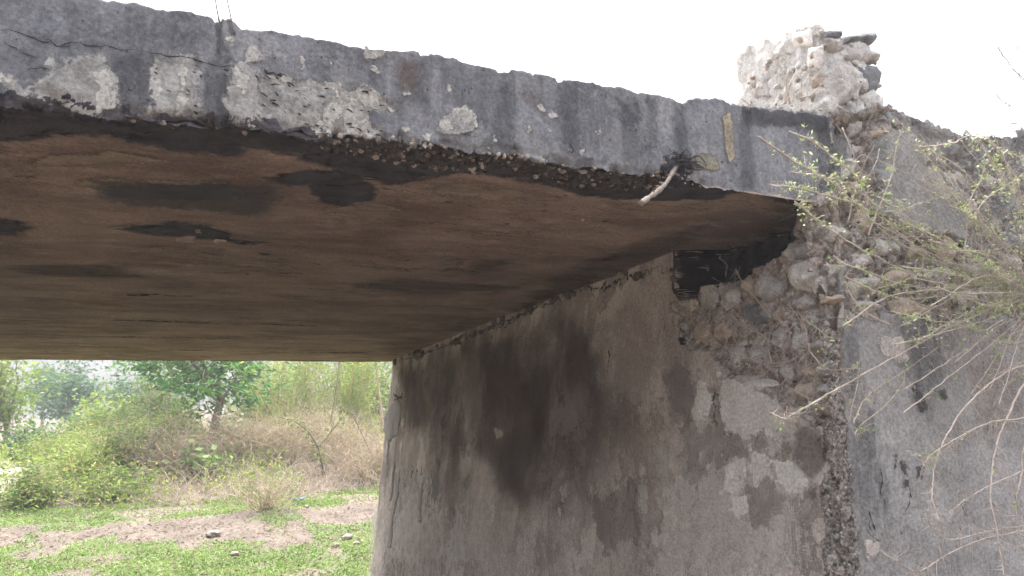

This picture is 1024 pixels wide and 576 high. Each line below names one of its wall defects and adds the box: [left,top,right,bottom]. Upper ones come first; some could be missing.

crack [2,29,234,70]
peeling [0,46,720,198]
damp [0,103,740,245]
damp [756,194,801,205]
spalling [636,102,1024,576]
damp [912,383,928,413]
damp [894,454,925,487]